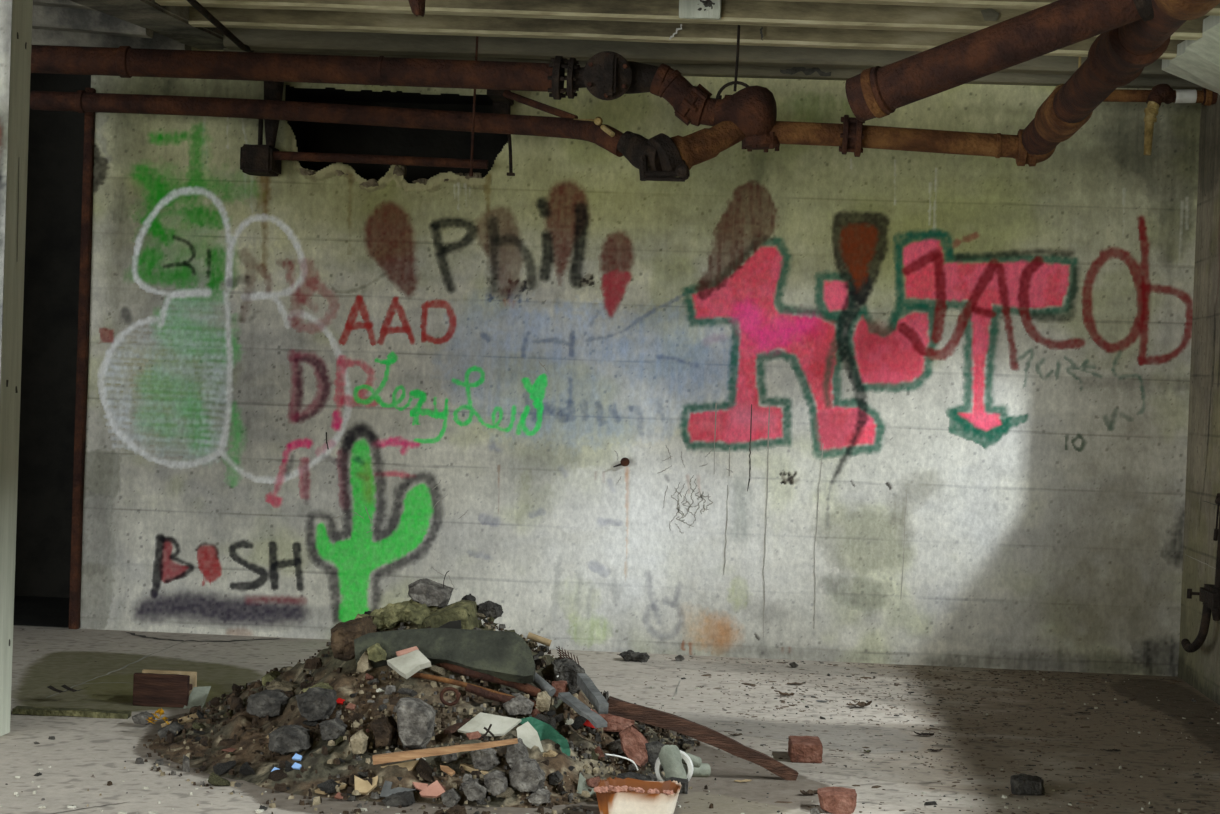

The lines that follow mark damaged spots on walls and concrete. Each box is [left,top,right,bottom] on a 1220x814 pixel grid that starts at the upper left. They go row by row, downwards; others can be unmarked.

spalling [291,137,485,194]